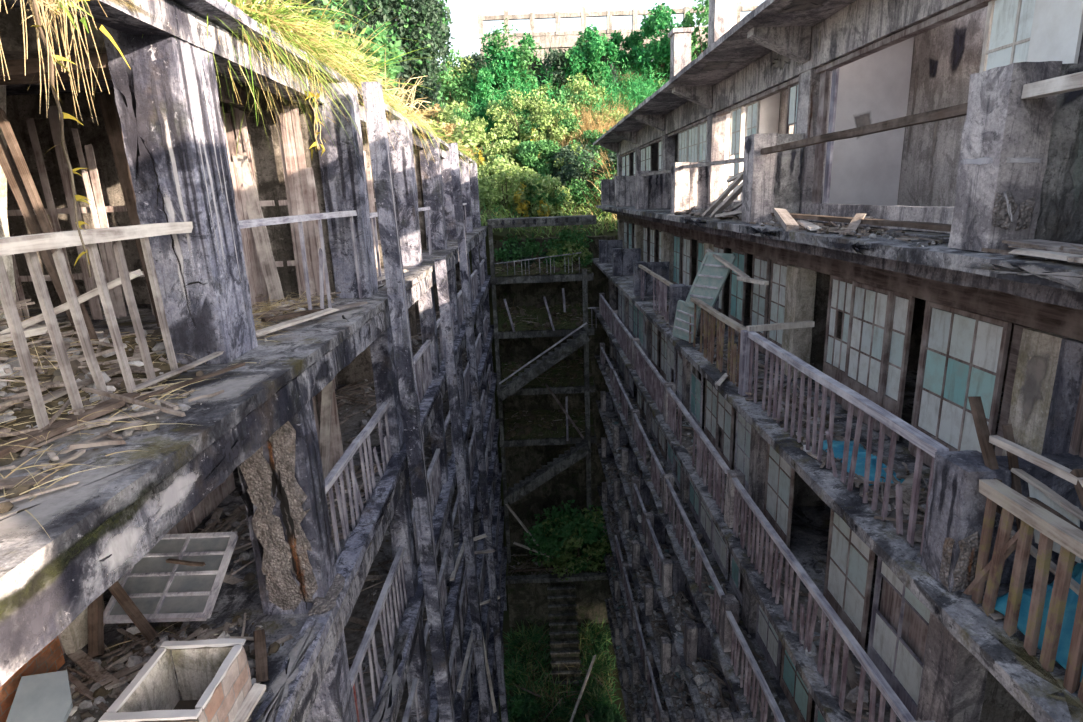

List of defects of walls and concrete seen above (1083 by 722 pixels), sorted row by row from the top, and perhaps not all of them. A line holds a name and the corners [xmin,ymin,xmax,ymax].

spalling [993,115,1083,243]
crack [146,140,205,328]
leakage [0,462,143,535]
leakage [98,528,143,571]
spalling [239,421,345,615]
spalling [939,531,980,593]
leakage [0,584,65,664]